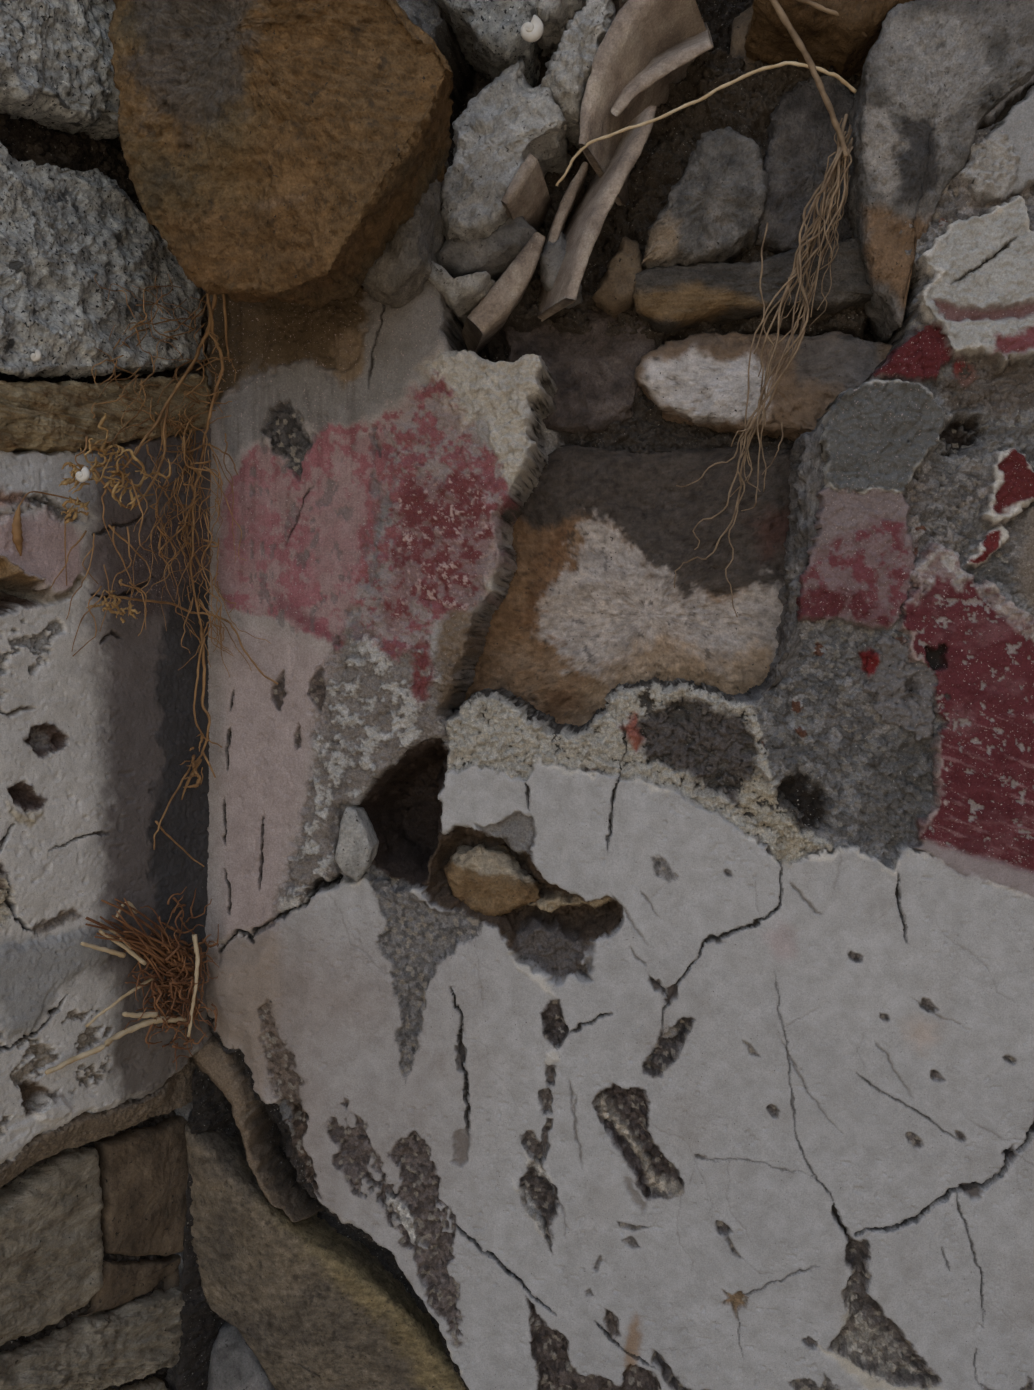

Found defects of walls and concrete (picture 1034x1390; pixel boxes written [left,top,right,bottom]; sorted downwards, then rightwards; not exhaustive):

crack [977,83,1034,130]
flaking render [798,379,1034,874]
spalling [358,682,835,1084]
crack [648,859,784,1031]
crack [895,872,909,944]
spalling [258,1000,322,1199]
spalling [327,1098,464,1348]
crack [450,986,472,1138]
crack [455,1221,557,1317]
spalling [593,1017,696,1201]
crack [694,972,1034,1385]
spalling [803,1229,942,1390]